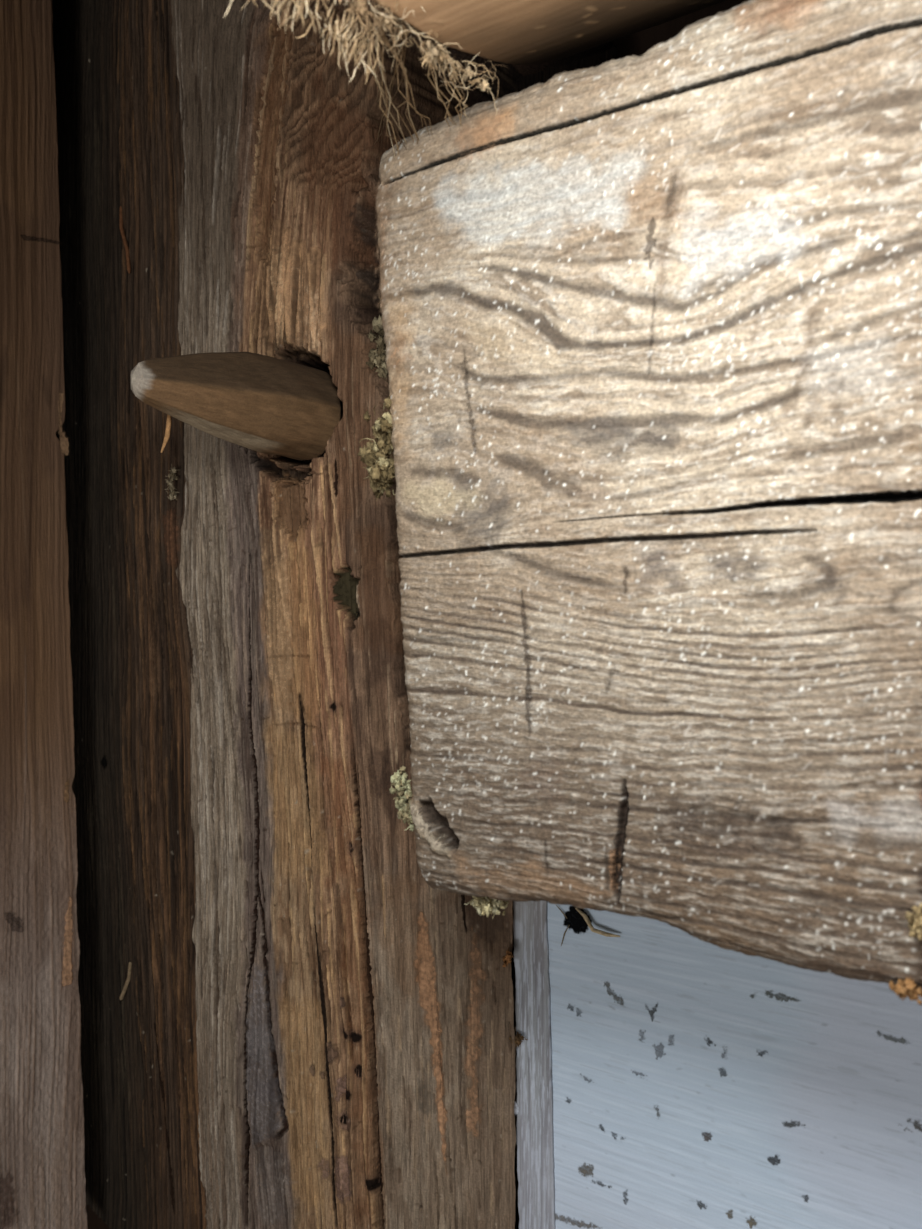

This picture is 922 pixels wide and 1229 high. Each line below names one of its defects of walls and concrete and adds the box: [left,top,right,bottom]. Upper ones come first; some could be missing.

crack [385,19,922,185]
crack [400,490,922,557]
peeling [750,991,799,1002]
peeling [639,1004,674,1059]
peeling [578,1163,610,1188]
peeling [555,1214,597,1228]